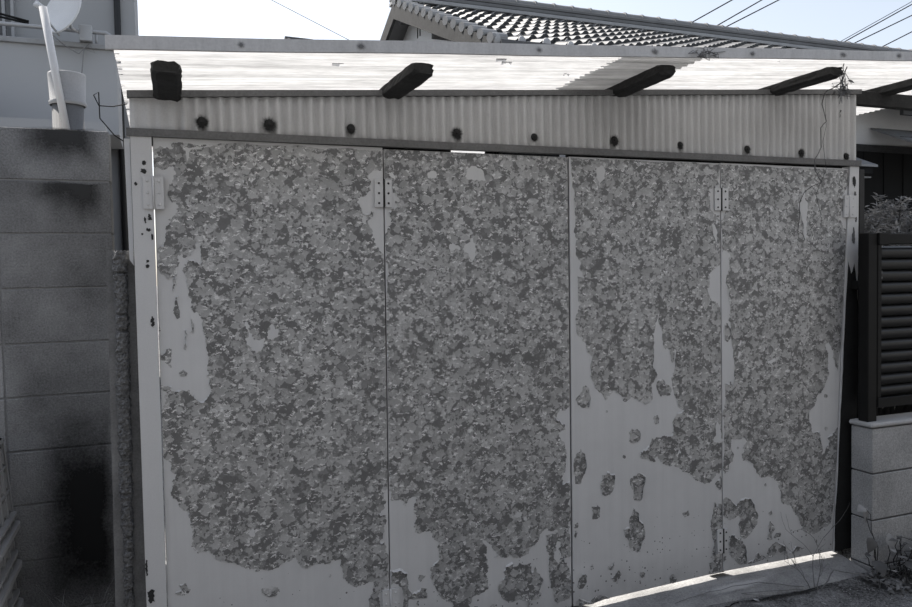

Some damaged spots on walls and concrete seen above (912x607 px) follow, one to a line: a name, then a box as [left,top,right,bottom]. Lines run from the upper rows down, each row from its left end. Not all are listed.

peeling [153,142,848,607]